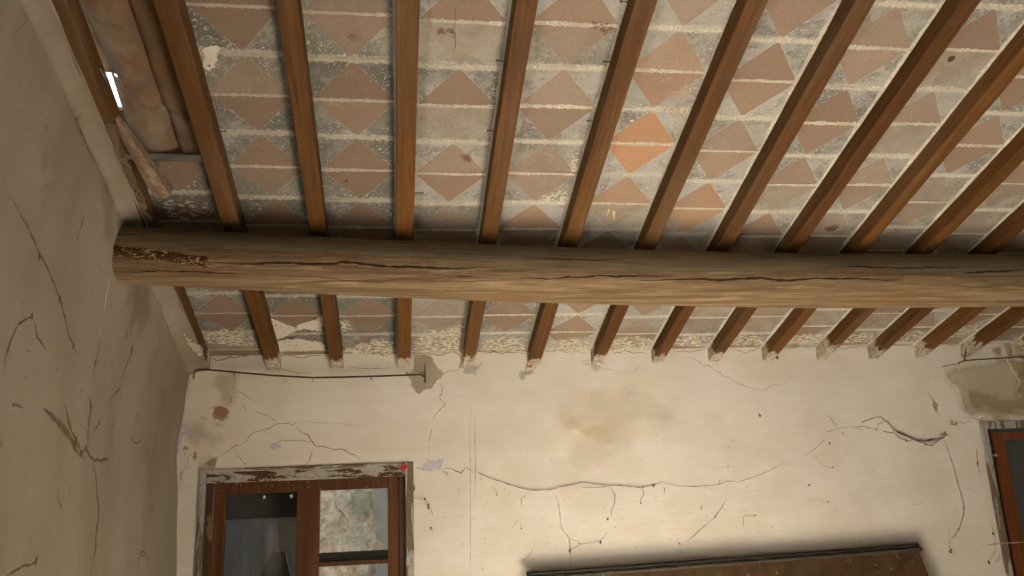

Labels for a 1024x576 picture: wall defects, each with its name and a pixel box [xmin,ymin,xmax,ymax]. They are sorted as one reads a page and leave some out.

crack [220,391,365,468]
crack [281,352,461,469]
flaking render [403,353,444,396]